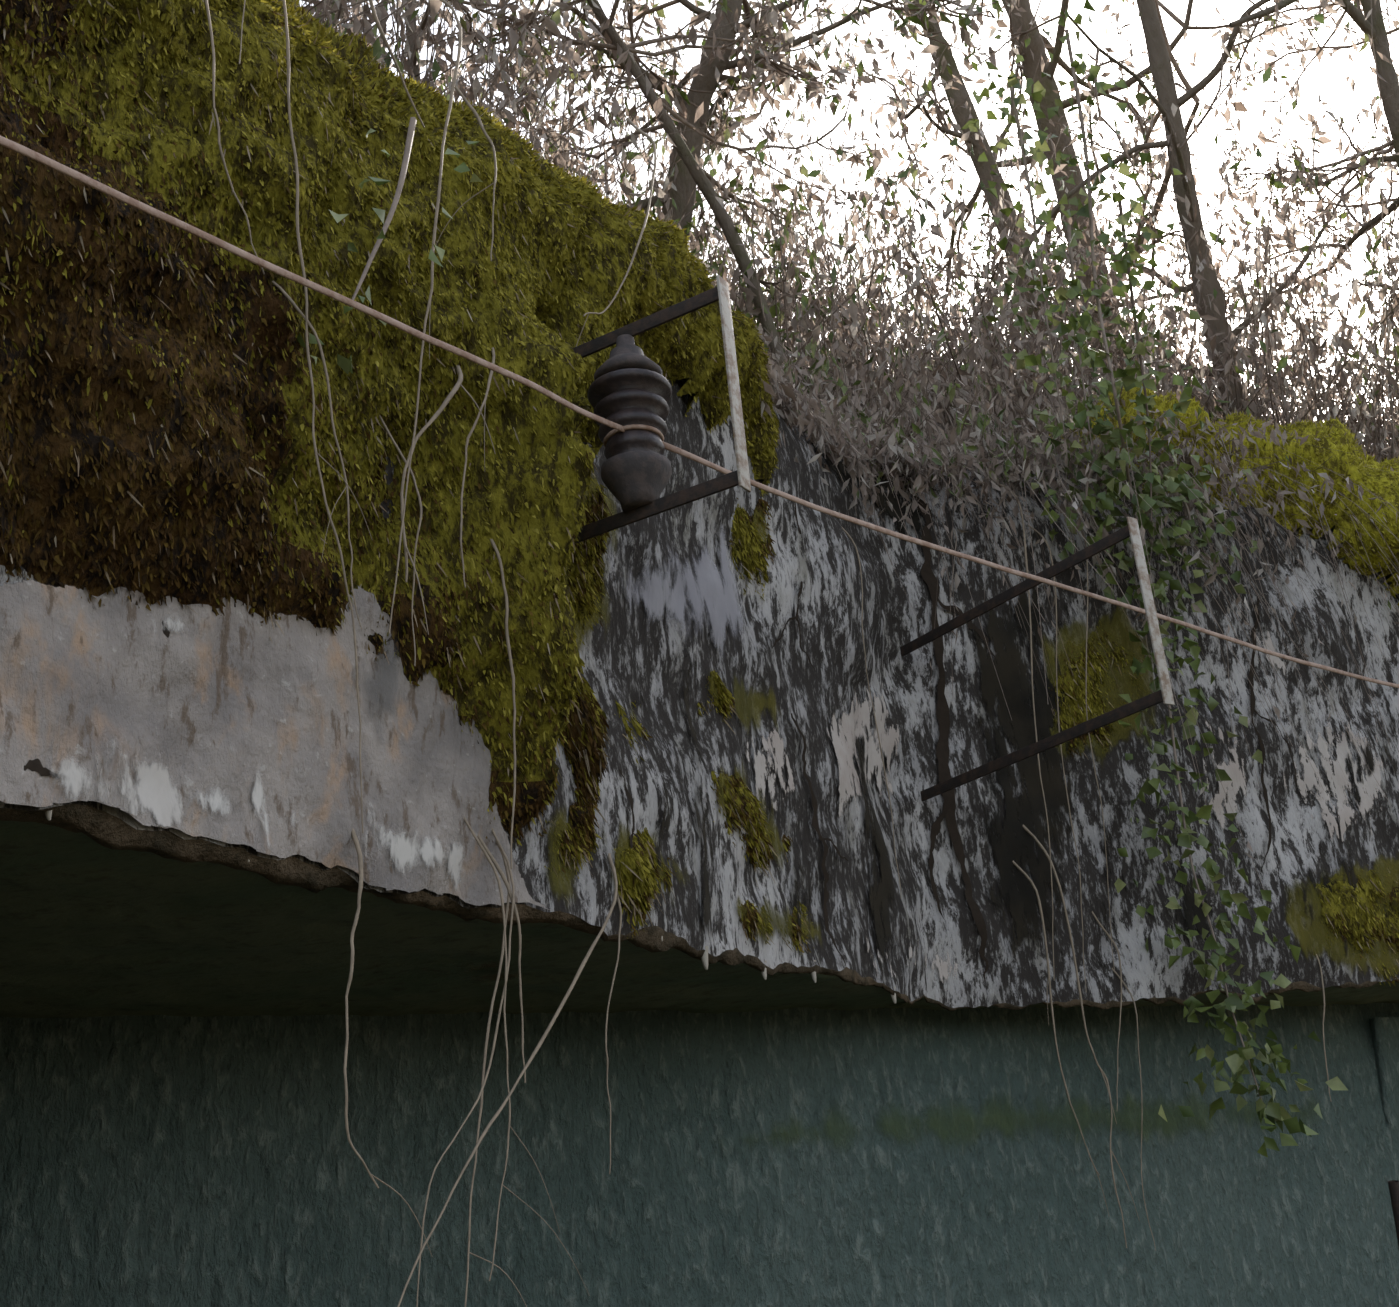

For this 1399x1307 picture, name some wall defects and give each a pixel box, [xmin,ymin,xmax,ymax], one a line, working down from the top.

spalling [0,579,550,910]
peeling [747,730,795,810]
peeling [827,689,900,817]
peeling [1203,706,1255,828]
peeling [1283,721,1385,842]
peeling [866,938,958,982]